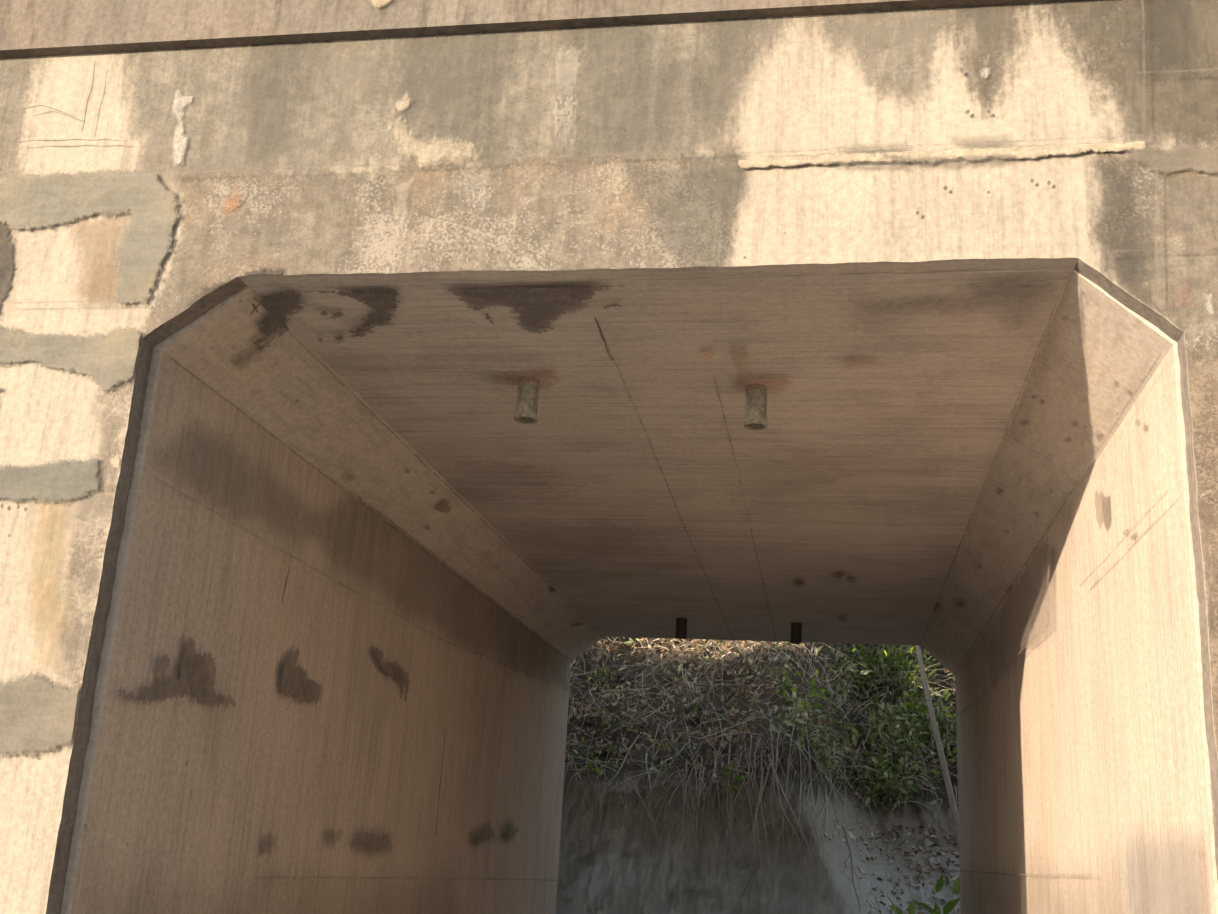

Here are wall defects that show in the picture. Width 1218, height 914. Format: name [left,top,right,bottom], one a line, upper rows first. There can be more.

water stain [822,0,1218,149]
water stain [129,16,784,352]
water stain [1098,151,1218,754]
water stain [119,637,237,708]
water stain [281,648,323,704]
water stain [373,647,409,701]